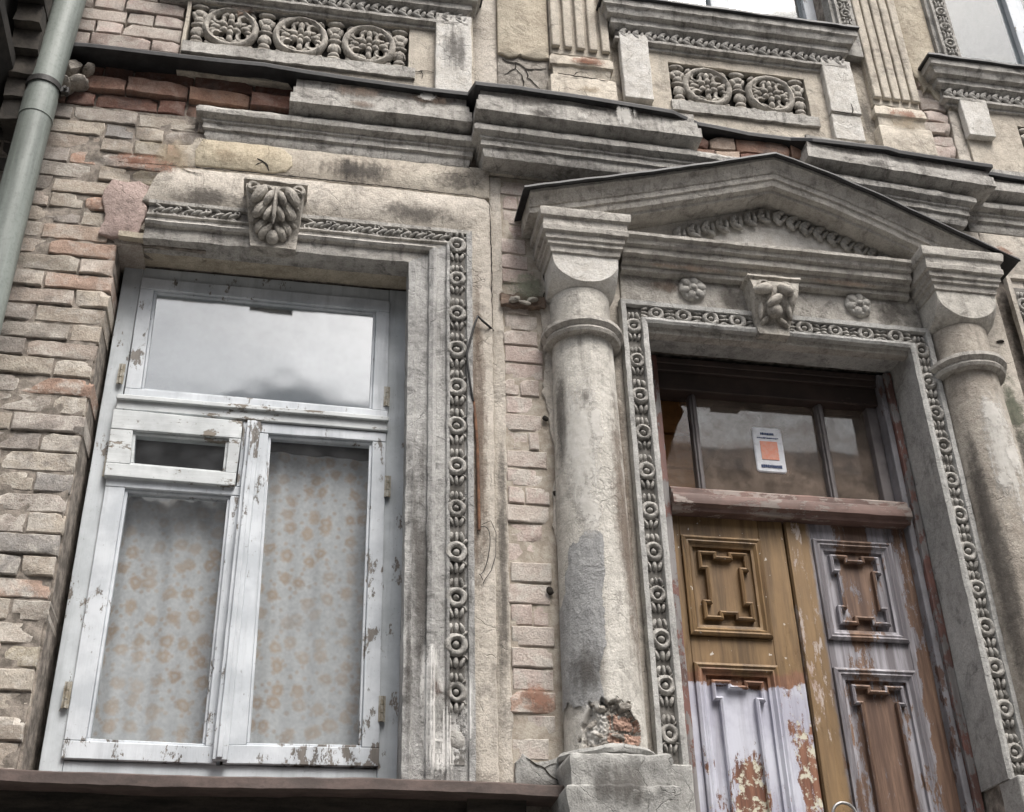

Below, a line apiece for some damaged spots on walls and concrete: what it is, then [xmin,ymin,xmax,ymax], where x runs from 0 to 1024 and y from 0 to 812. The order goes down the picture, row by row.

crack [502,58,606,89]
damp [334,160,381,180]
spalling [578,698,641,748]
crack [526,758,558,781]